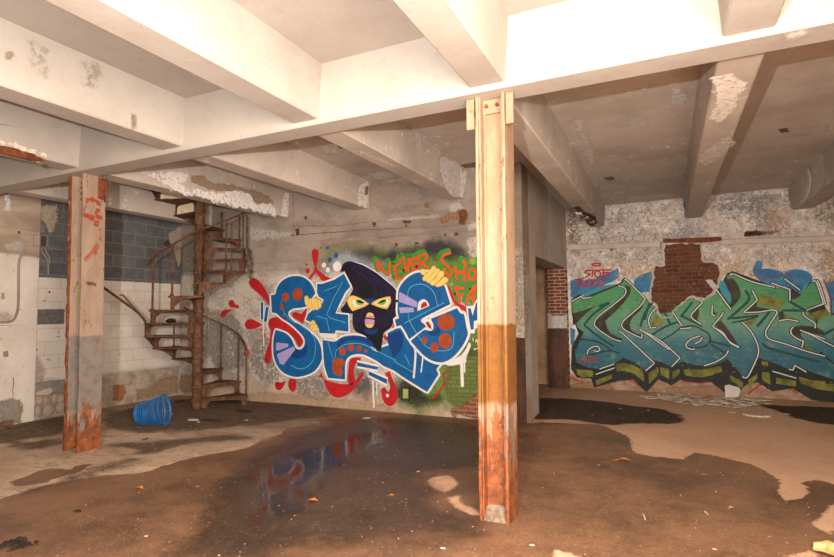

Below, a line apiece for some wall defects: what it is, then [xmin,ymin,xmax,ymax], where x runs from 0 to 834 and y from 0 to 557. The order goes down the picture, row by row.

peeling [708,73,749,123]
corrosion [0,146,47,168]
peeling [141,171,289,218]
peeling [249,227,292,242]
crack [568,201,679,263]
crack [711,188,822,270]
flaking render [649,243,722,318]
spalling [0,399,23,427]